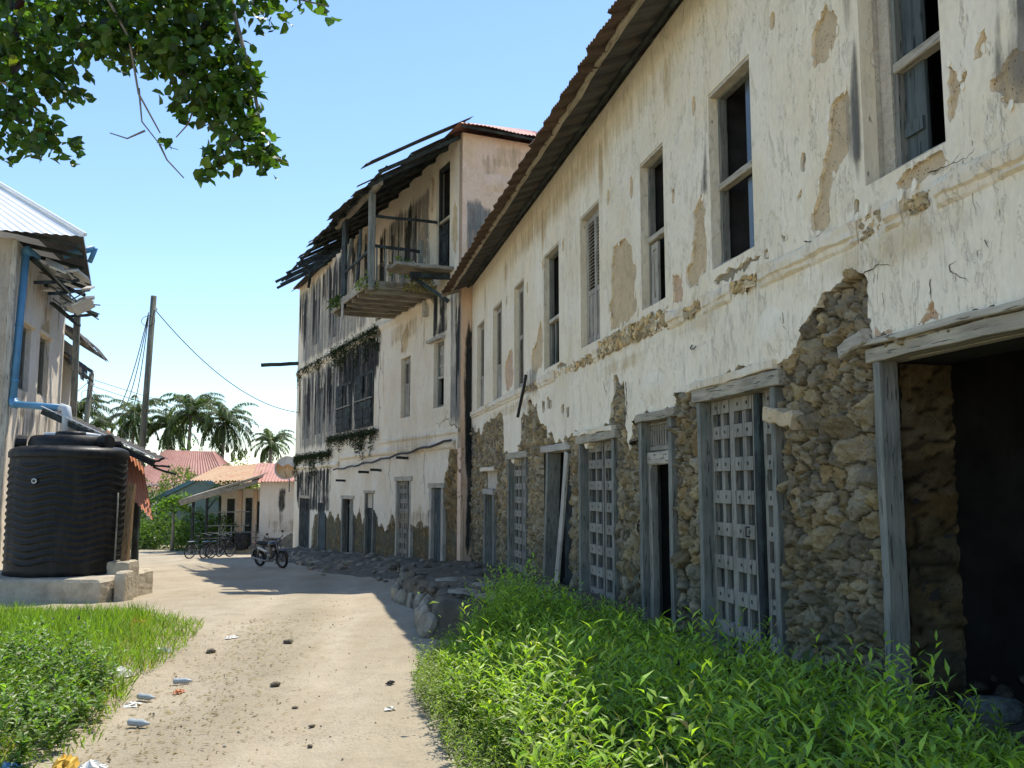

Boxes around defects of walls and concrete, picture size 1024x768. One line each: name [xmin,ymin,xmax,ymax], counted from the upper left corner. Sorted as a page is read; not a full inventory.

peeling [811,7,839,66]
damp [848,55,859,160]
peeling [946,59,967,119]
peeling [994,51,1024,112]
peeling [812,85,851,231]
peeling [897,151,949,203]
damp [298,190,429,448]
peeling [609,239,639,333]
peeling [665,194,707,314]